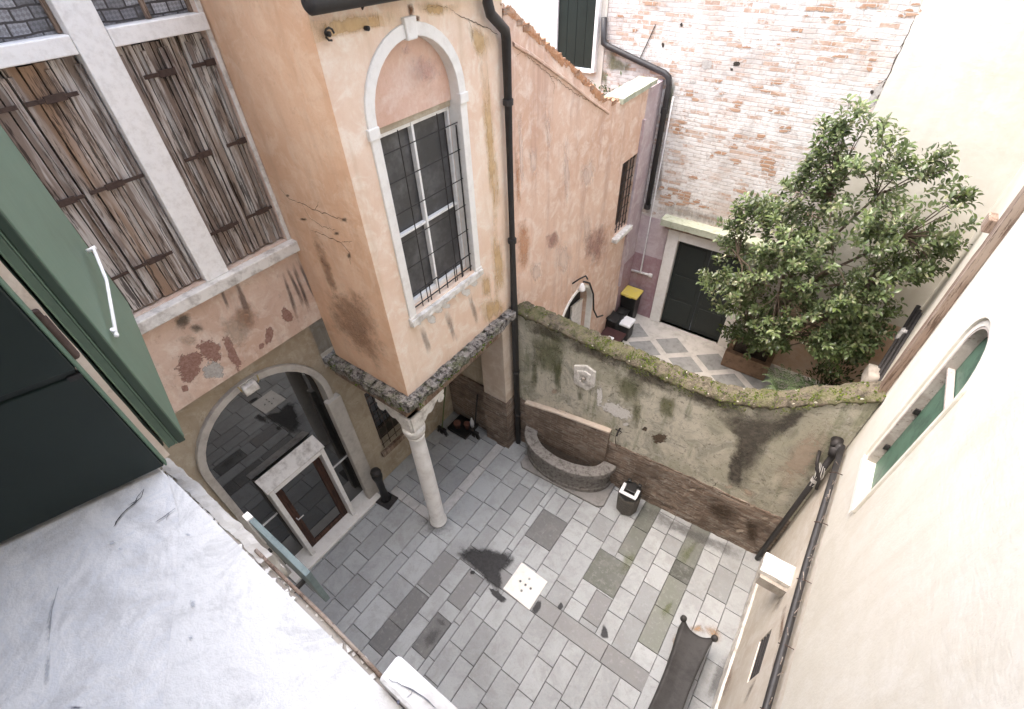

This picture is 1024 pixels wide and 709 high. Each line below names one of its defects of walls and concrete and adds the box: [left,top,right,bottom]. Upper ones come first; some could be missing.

crack [283,192,351,263]
water stain [237,286,251,326]
flaking render [281,307,293,322]
water stain [286,266,312,310]
flaking render [259,327,273,349]
flaking render [174,336,241,392]
water stain [575,344,803,507]